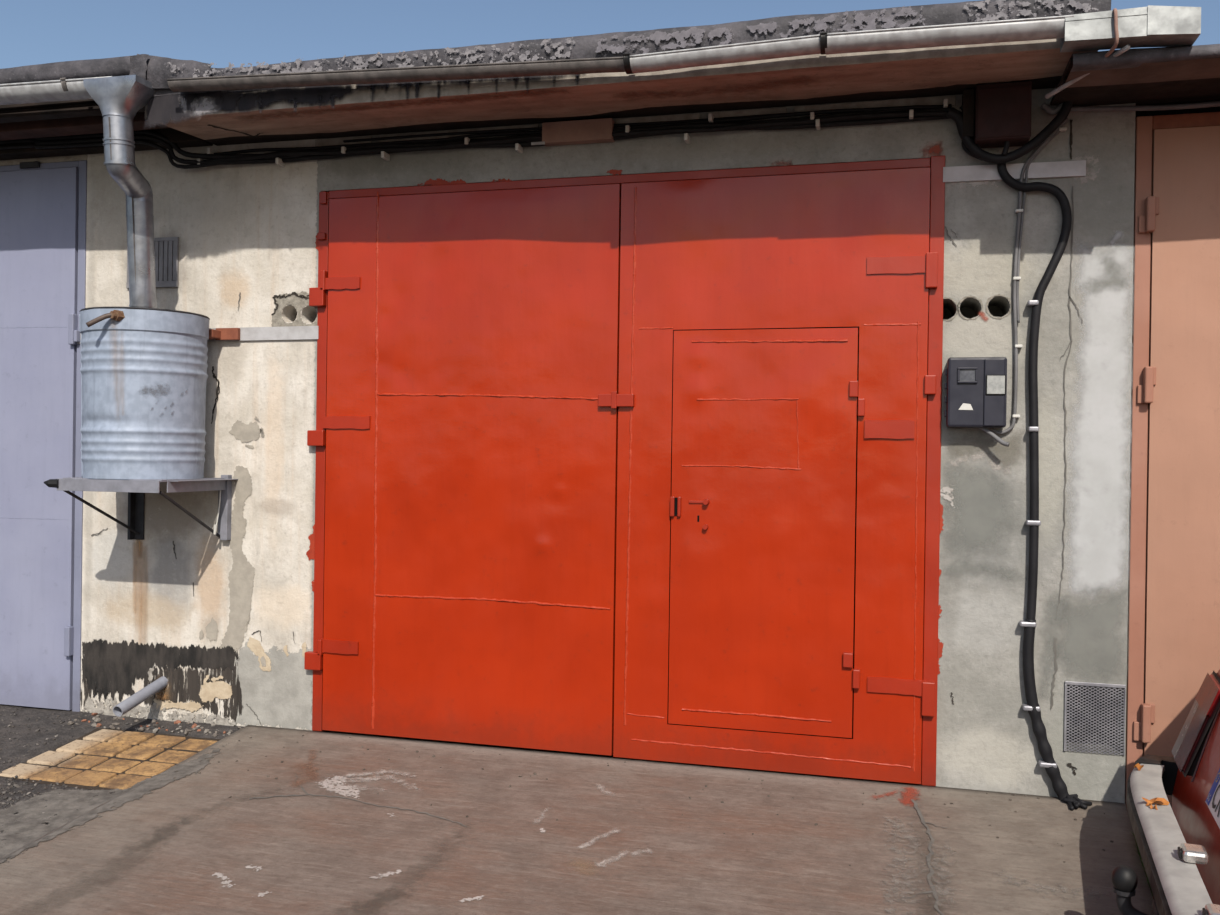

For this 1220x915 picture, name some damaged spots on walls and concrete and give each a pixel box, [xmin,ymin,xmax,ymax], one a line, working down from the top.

leakage [145,74,579,127]
spalling [271,291,318,327]
peeling [229,417,264,449]
crack [1050,120,1083,709]
peeling [82,466,313,730]